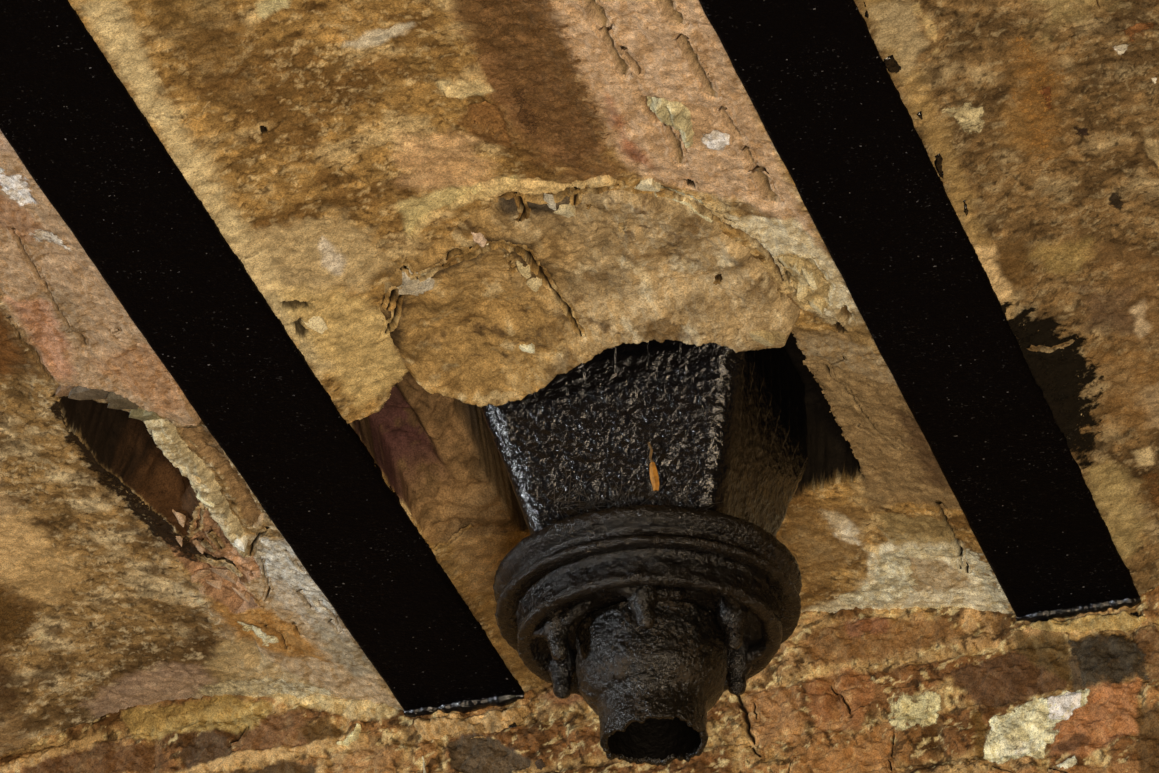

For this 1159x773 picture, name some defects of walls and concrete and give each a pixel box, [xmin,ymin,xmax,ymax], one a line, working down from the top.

crack [10,228,121,346]
water stain [0,589,37,649]
flaking render [0,288,271,615]
spalling [349,371,529,545]
spalling [784,330,870,502]
crack [933,502,972,574]